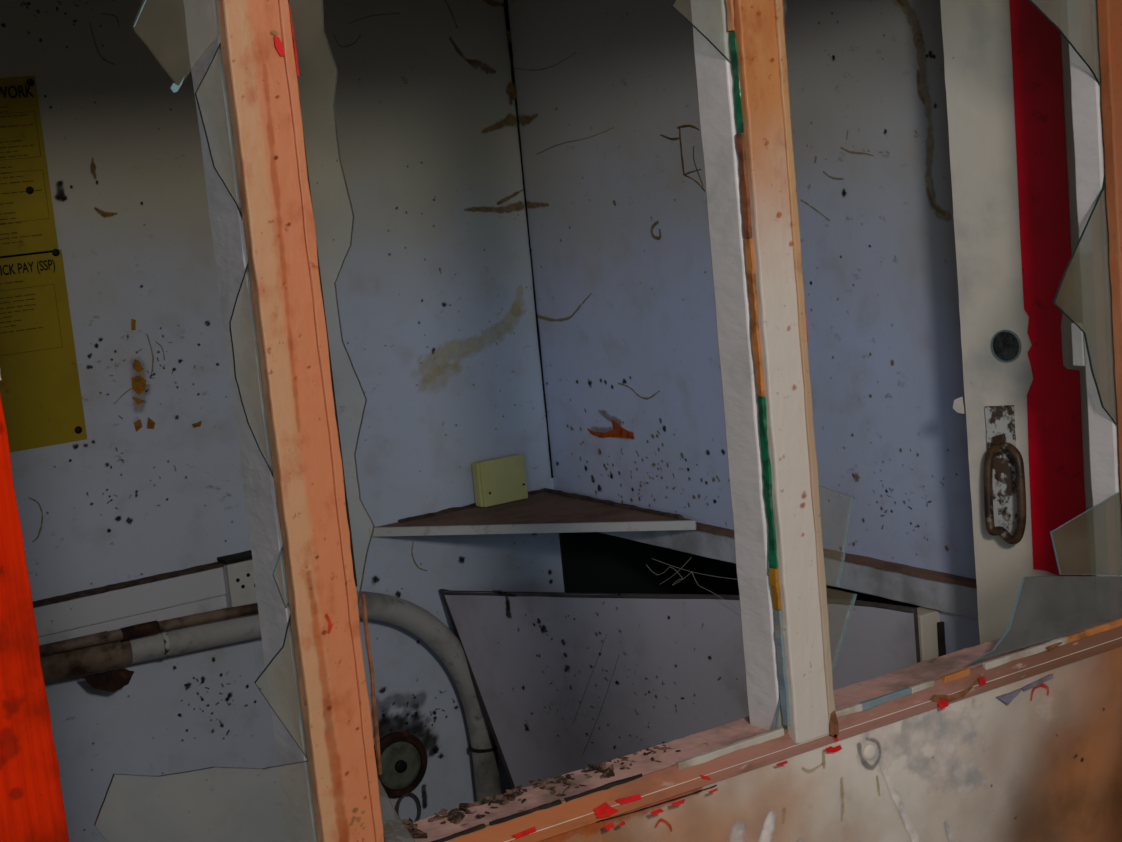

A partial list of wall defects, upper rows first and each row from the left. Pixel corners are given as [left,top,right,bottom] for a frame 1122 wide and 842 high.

crack [801,129,887,221]
crack [504,0,614,478]
corrosion [570,420,648,443]